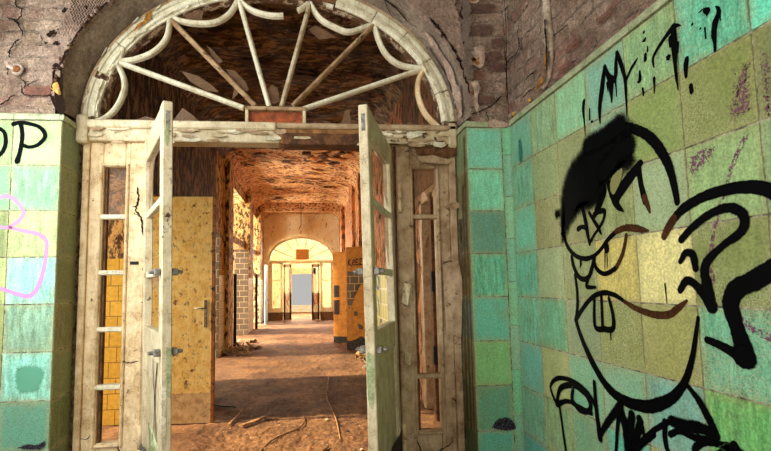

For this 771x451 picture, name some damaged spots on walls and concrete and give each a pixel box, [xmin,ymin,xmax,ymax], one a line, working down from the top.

crack [0,0,51,105]
flaking render [24,0,114,115]
crack [384,0,415,27]
crack [472,0,536,120]
flaking render [83,0,505,244]
crack [134,187,143,234]
peeling [402,282,411,306]
peeling [442,260,462,337]
peeling [148,347,172,451]